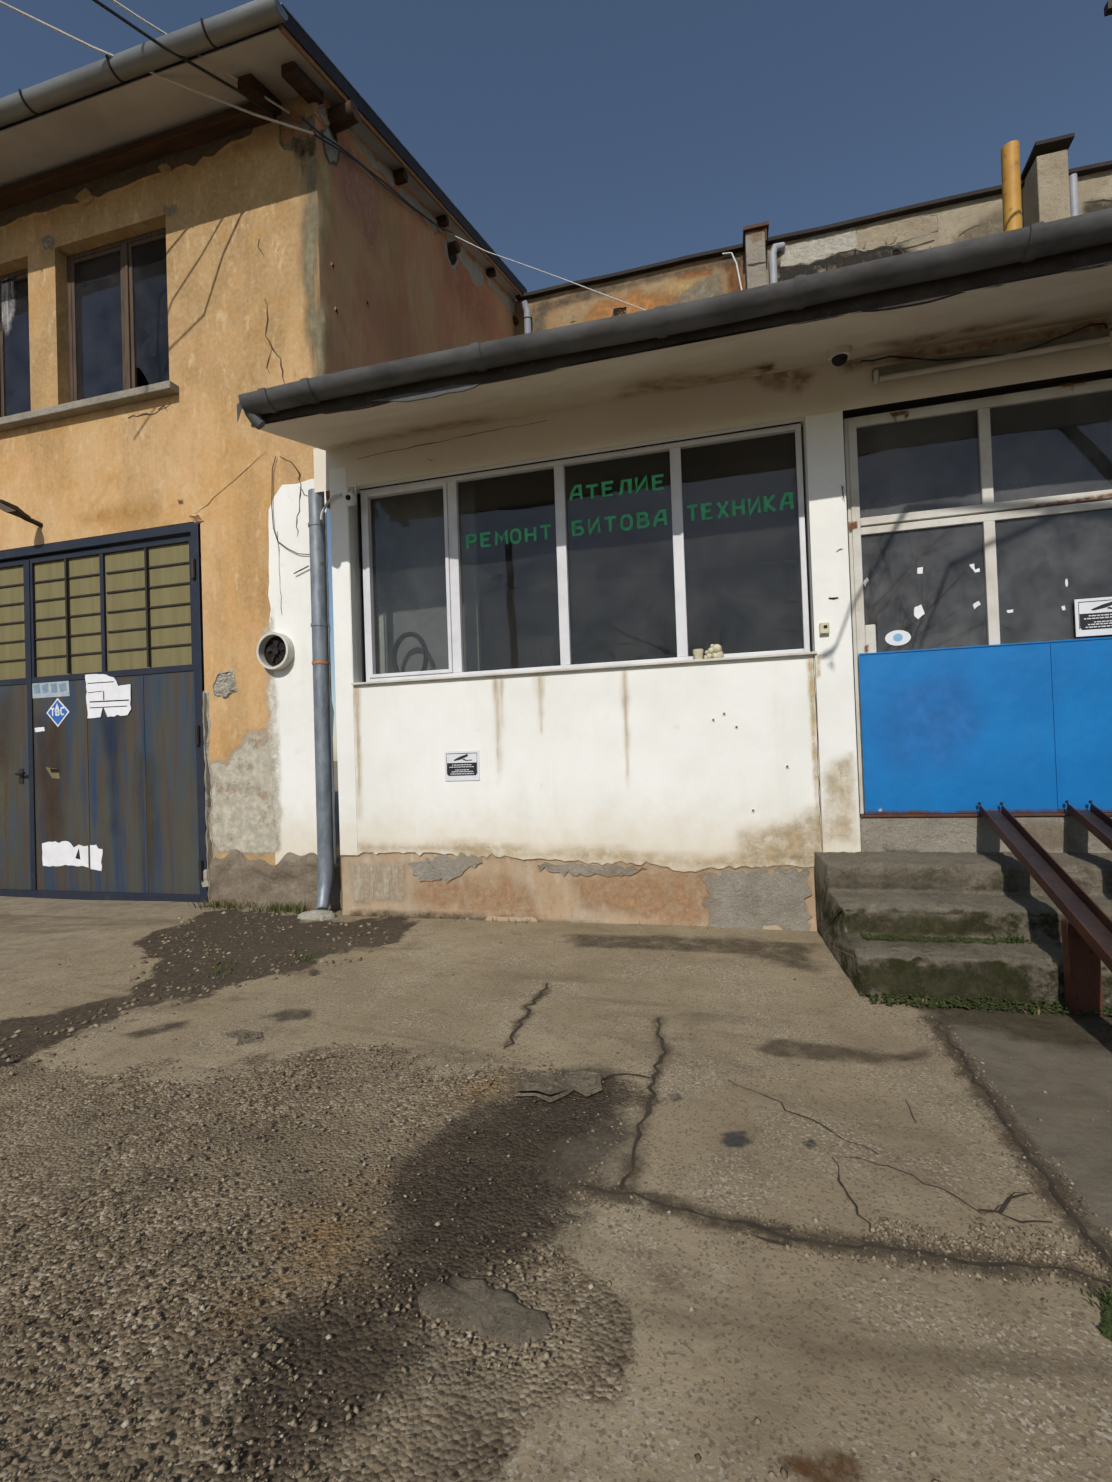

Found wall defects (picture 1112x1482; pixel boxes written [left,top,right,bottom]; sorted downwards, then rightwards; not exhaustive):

flaking render [407,852,482,884]
flaking render [537,862,647,877]